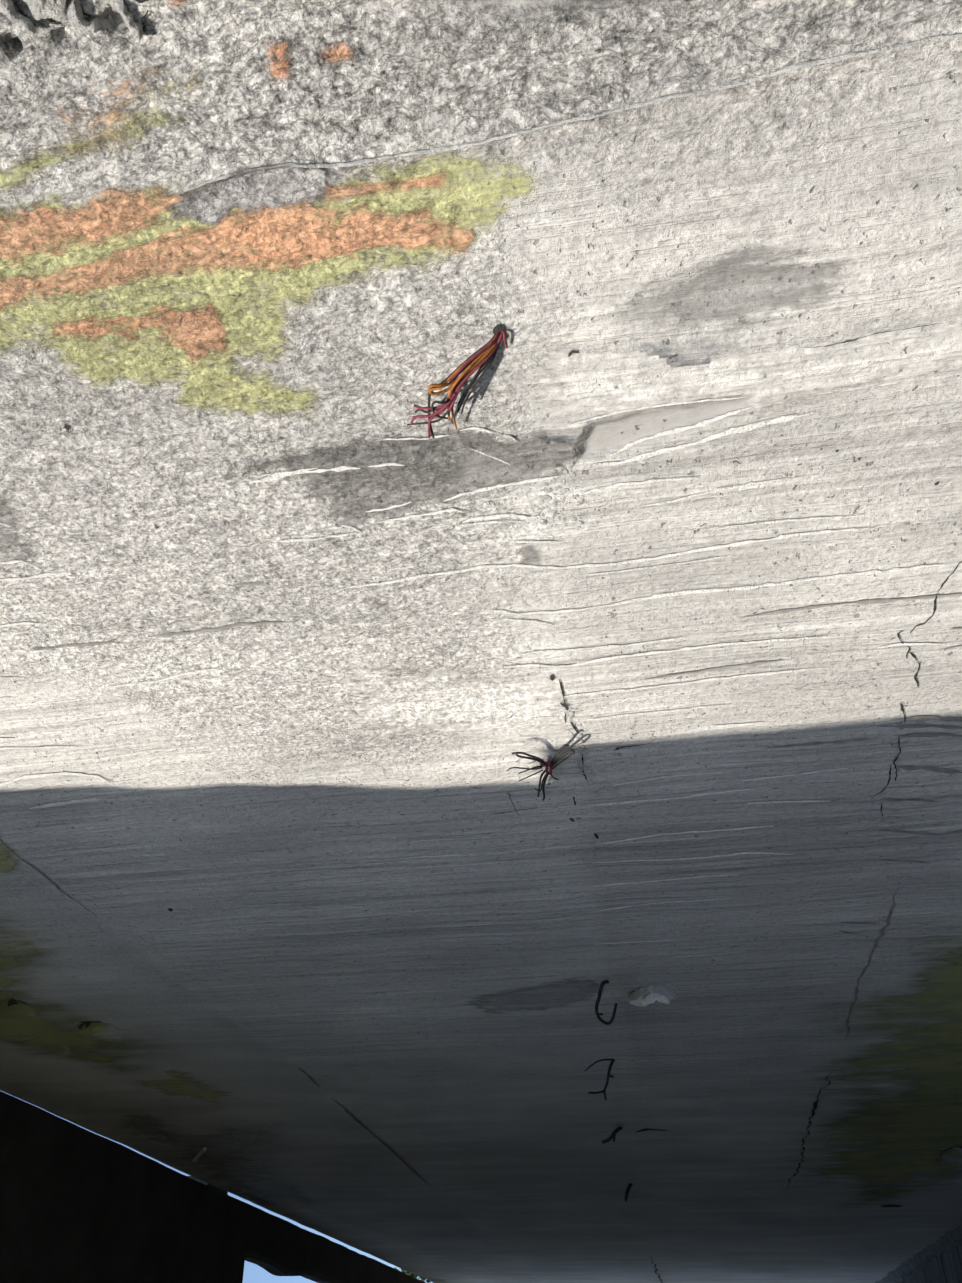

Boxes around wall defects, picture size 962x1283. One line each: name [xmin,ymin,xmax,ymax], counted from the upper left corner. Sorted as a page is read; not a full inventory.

corrosion [0,153,531,415]
crack [871,561,962,817]
water stain [0,941,129,1063]
crack [845,888,899,1041]
crack [787,1072,831,1189]